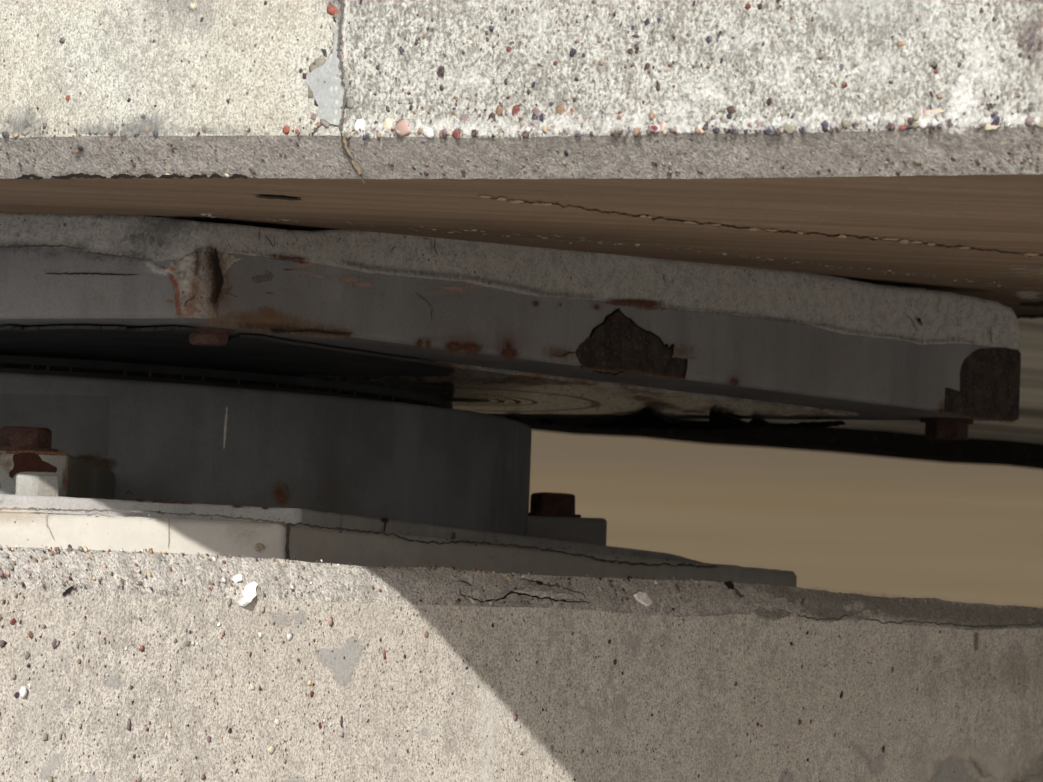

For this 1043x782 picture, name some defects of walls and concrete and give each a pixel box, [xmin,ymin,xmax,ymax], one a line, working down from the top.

crack [336,0,347,129]
peeling [550,299,692,380]
crack [458,579,591,603]